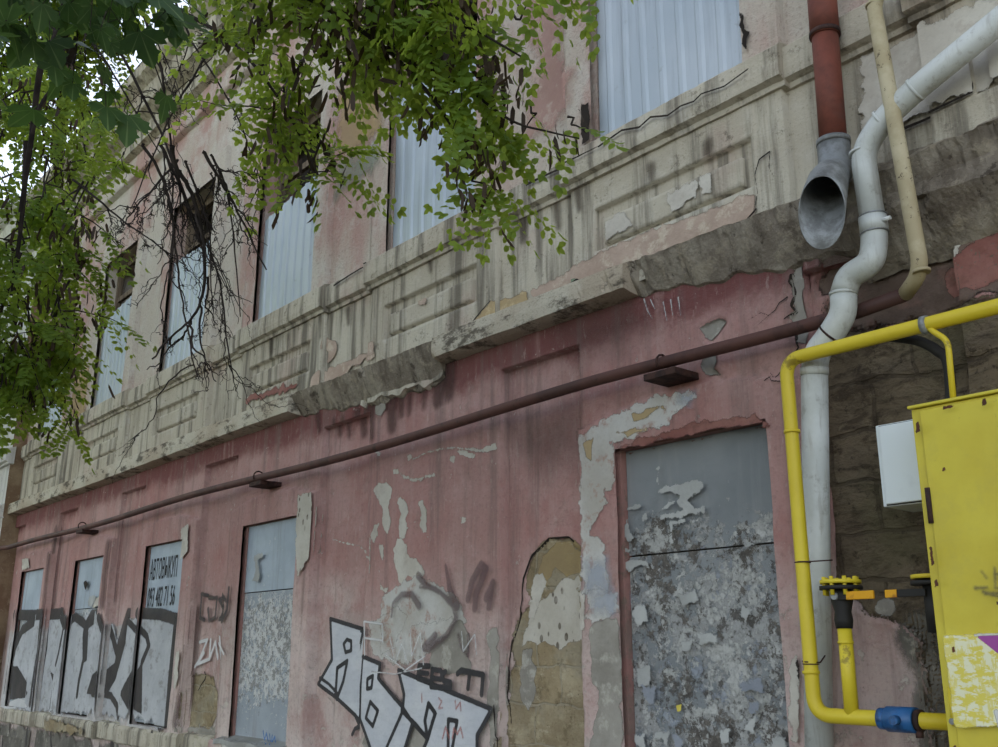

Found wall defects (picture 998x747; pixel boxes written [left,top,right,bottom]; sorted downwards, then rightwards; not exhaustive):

flaking render [475,194,756,320]
peeling [245,382,297,405]
peeling [310,337,375,387]
leakage [387,394,410,431]
leakage [423,363,454,406]
peeling [450,443,497,463]
peeling [180,524,188,559]
peeling [295,492,323,576]
peeling [369,469,471,676]
flaking render [486,389,770,747]
flaking render [173,651,218,736]